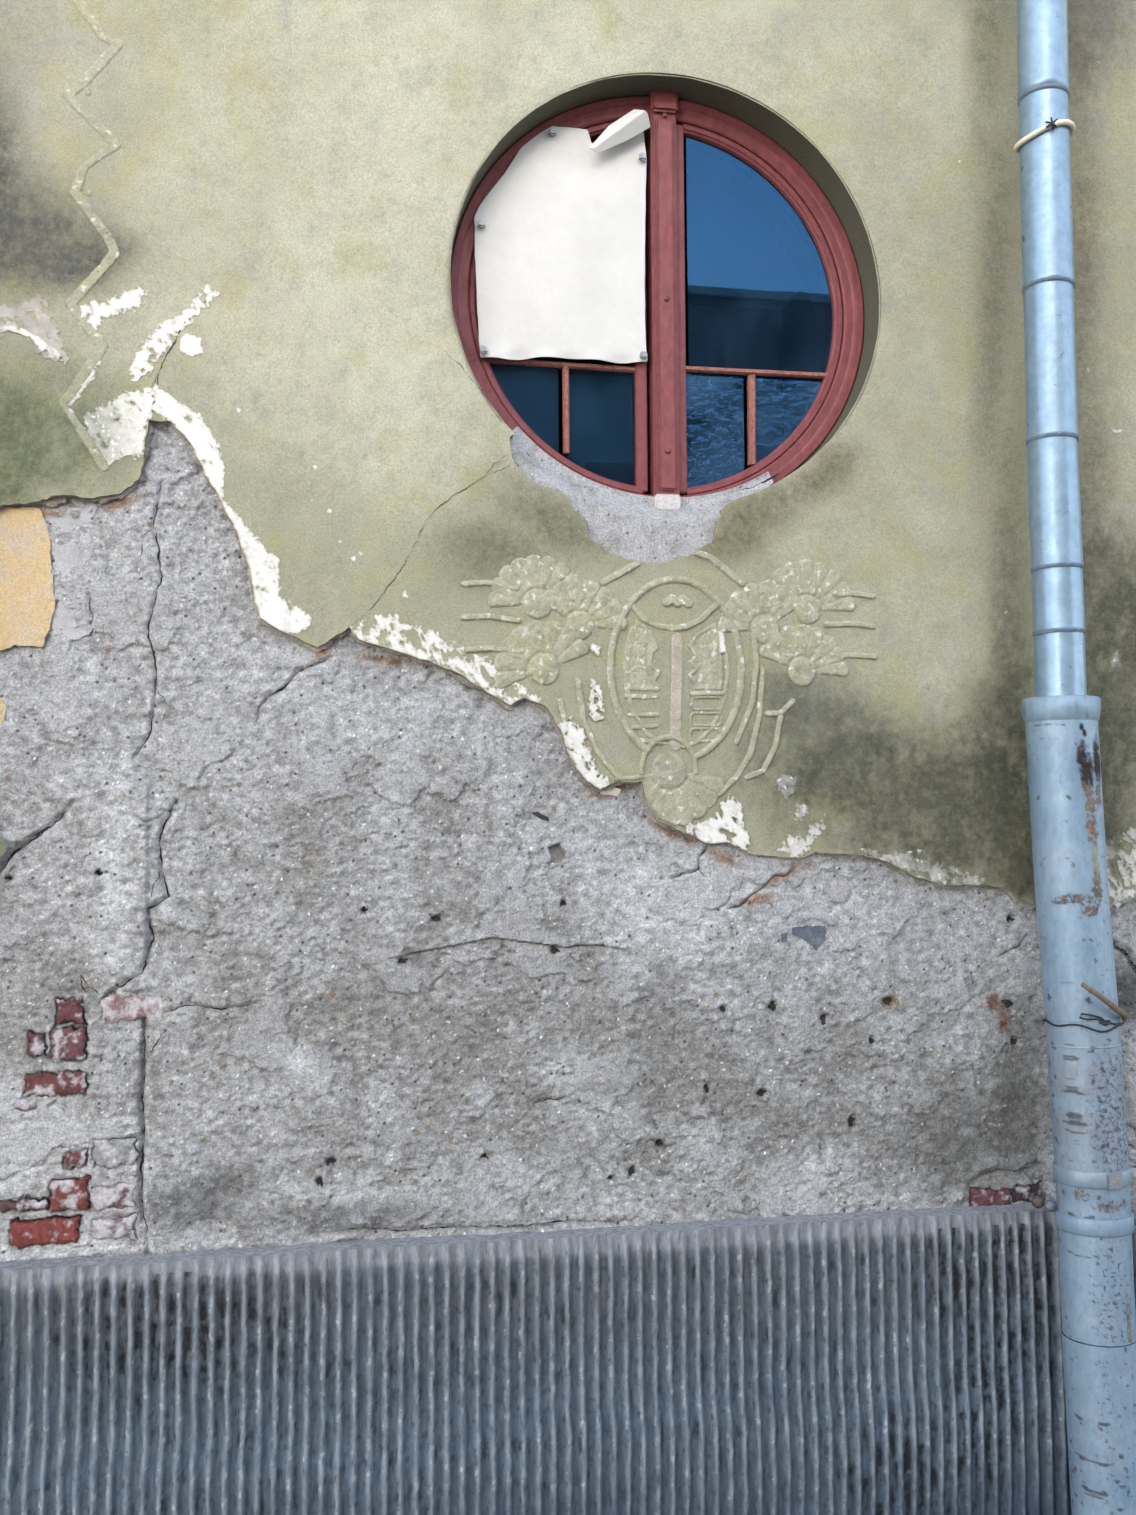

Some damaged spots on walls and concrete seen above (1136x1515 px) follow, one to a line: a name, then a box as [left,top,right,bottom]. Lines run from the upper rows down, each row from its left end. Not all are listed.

crack [0,805,72,872]
crack [80,804,174,995]
crack [135,482,168,757]
crack [256,658,330,720]
crack [352,451,517,625]
spalling [0,284,1056,1262]
crack [676,848,794,908]
damp [766,674,1036,905]
spalling [1105,827,1136,1199]
crack [1113,943,1136,974]
crack [109,1003,254,1252]